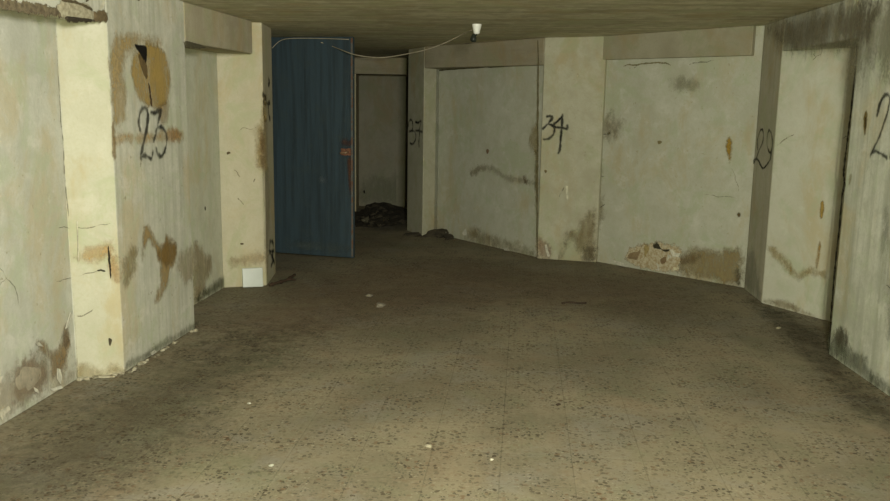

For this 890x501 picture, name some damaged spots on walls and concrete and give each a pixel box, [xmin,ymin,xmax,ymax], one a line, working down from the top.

spalling [0,0,108,23]
water stain [768,2,890,72]
water stain [111,36,158,124]
water stain [123,226,182,300]
spalling [611,240,682,273]
water stain [680,248,742,284]